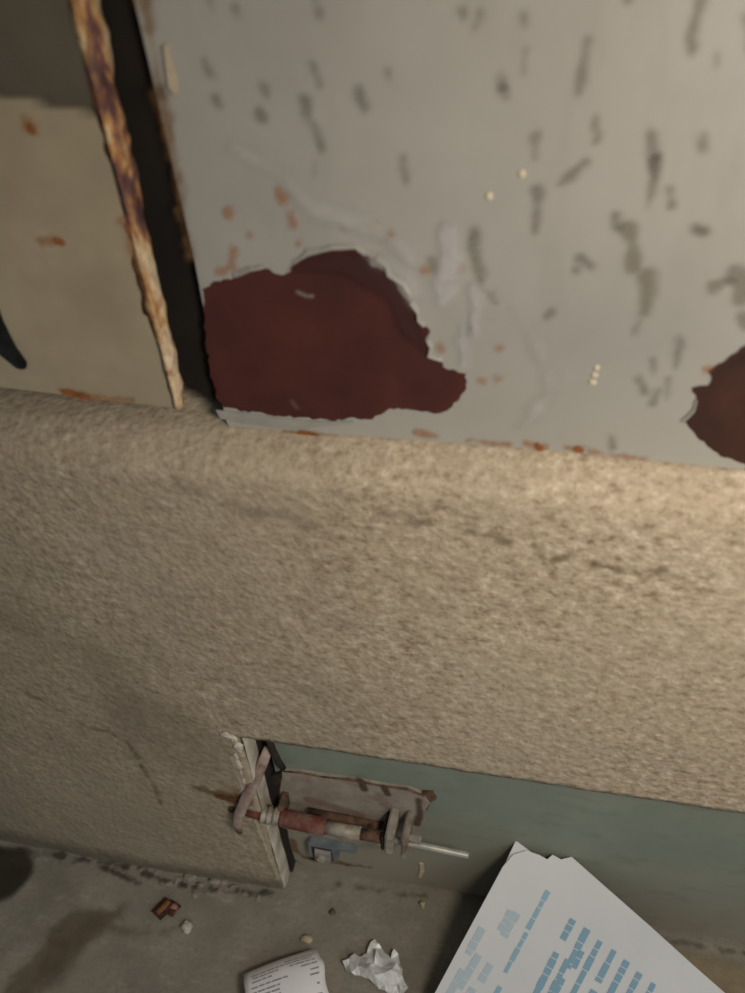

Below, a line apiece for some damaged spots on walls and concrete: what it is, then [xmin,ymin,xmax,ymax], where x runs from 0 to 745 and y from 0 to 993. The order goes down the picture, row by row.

corrosion [68,0,184,410]
damp [436,225,458,303]
peeling [202,244,467,421]
peeling [680,346,745,464]
corrosion [196,787,251,804]
damp [0,847,32,900]